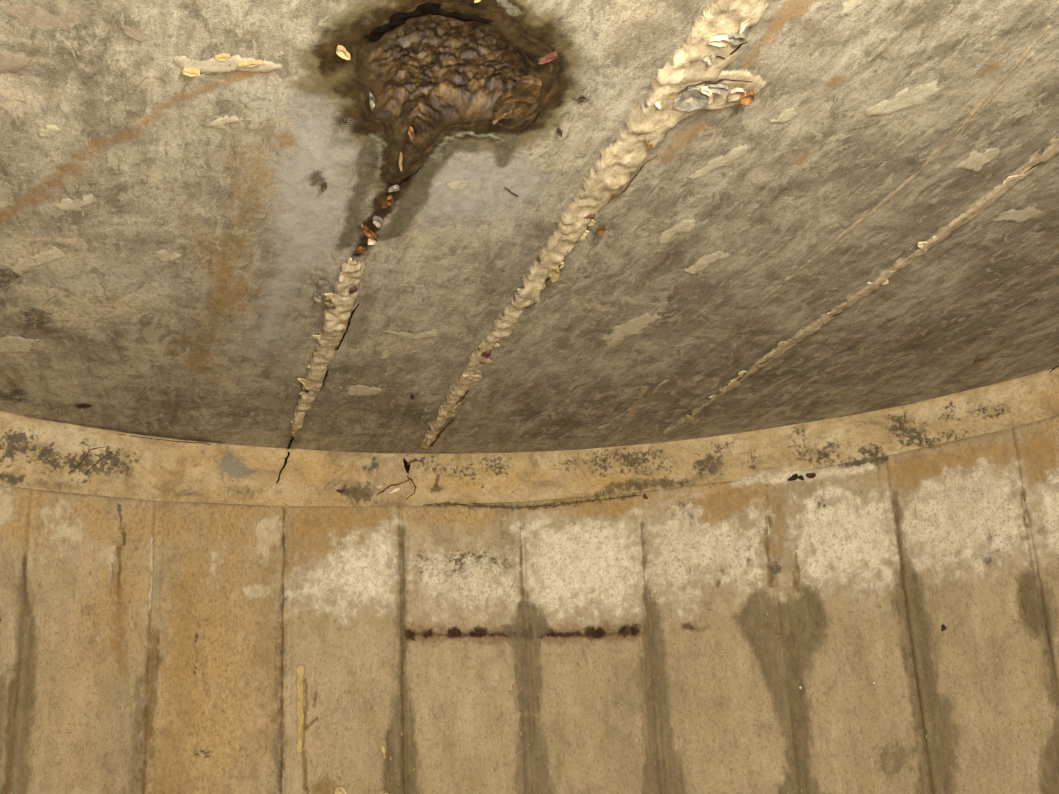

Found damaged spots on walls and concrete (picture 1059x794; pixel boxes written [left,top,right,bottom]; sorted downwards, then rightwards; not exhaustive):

crack [525,155,657,308]
crack [321,303,359,389]
crack [429,391,469,447]
leakage [0,430,142,483]
crack [276,436,295,484]
leakage [242,398,1059,794]
corrosion [405,624,639,640]